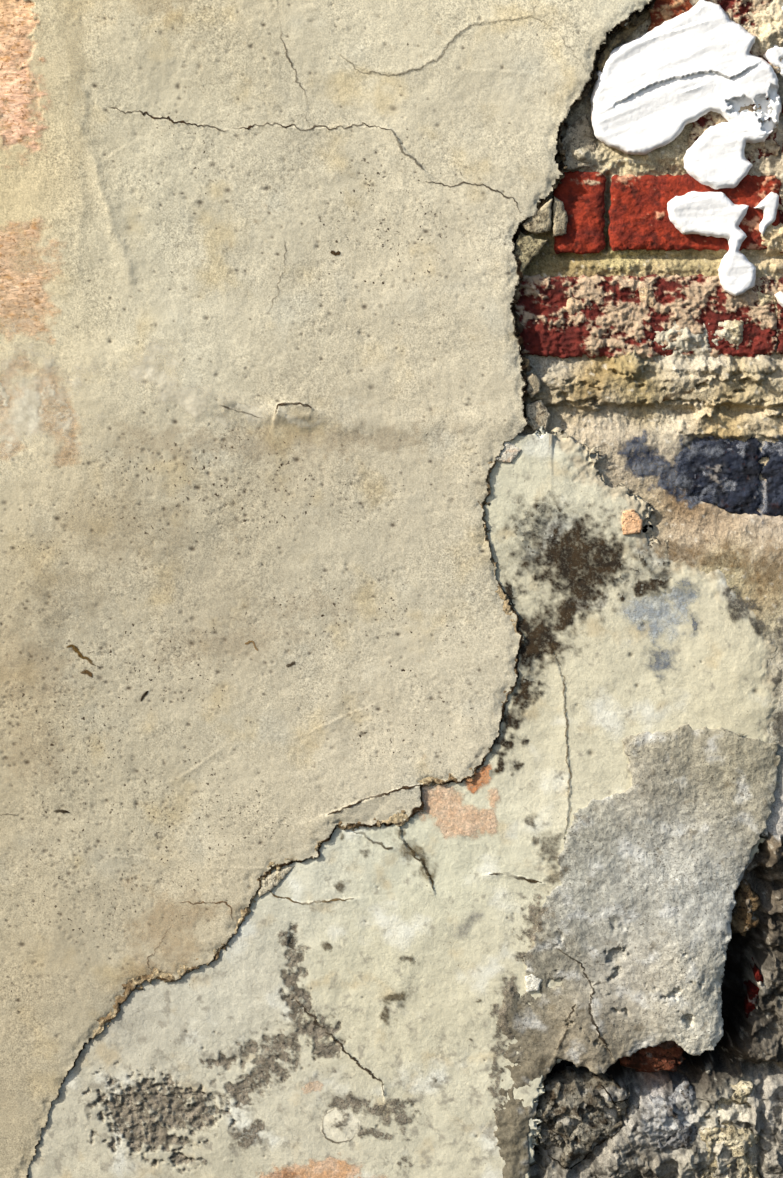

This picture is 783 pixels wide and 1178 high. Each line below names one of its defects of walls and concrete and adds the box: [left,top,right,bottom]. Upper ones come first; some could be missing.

flaking render [0,0,47,150]
crack [111,107,520,212]
flaking render [0,219,53,335]
spalling [51,0,656,1107]
crack [182,901,233,920]
crack [268,890,354,905]
crack [328,784,434,890]
crack [489,873,542,883]
spalling [85,925,346,1173]
crack [296,1000,384,1095]
spalling [328,1093,418,1140]